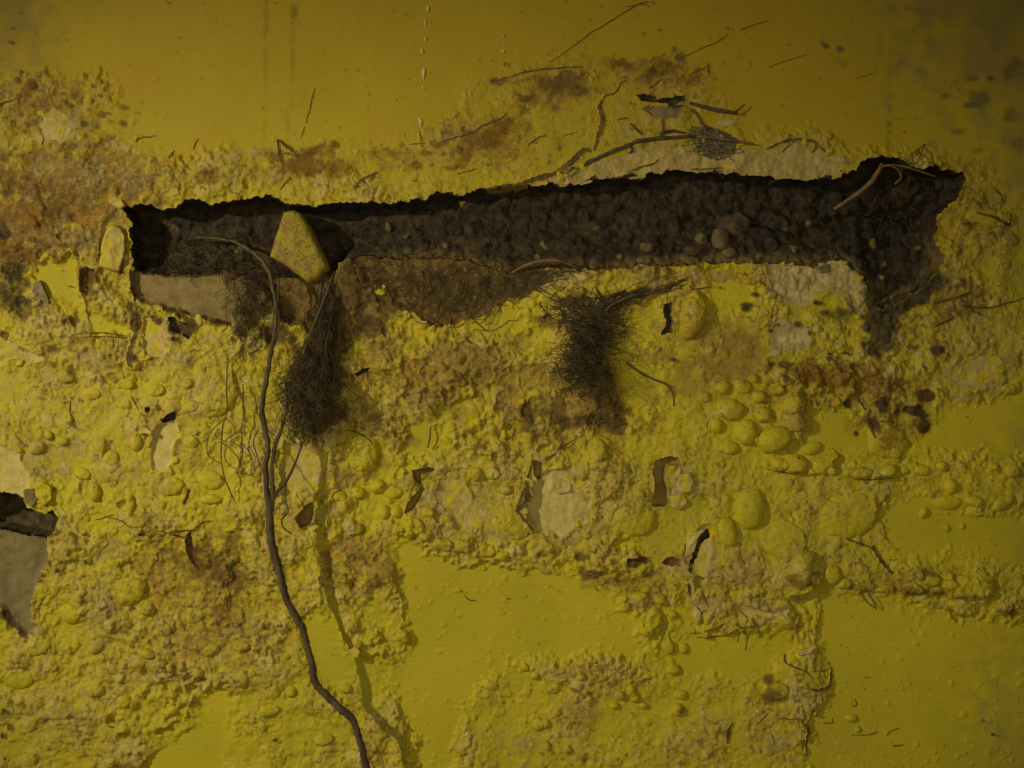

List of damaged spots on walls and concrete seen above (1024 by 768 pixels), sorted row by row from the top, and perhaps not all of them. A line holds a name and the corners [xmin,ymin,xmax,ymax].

corrosion [447,70,586,170]
spalling [53,119,966,367]
spalling [523,452,601,543]
spalling [0,529,49,642]